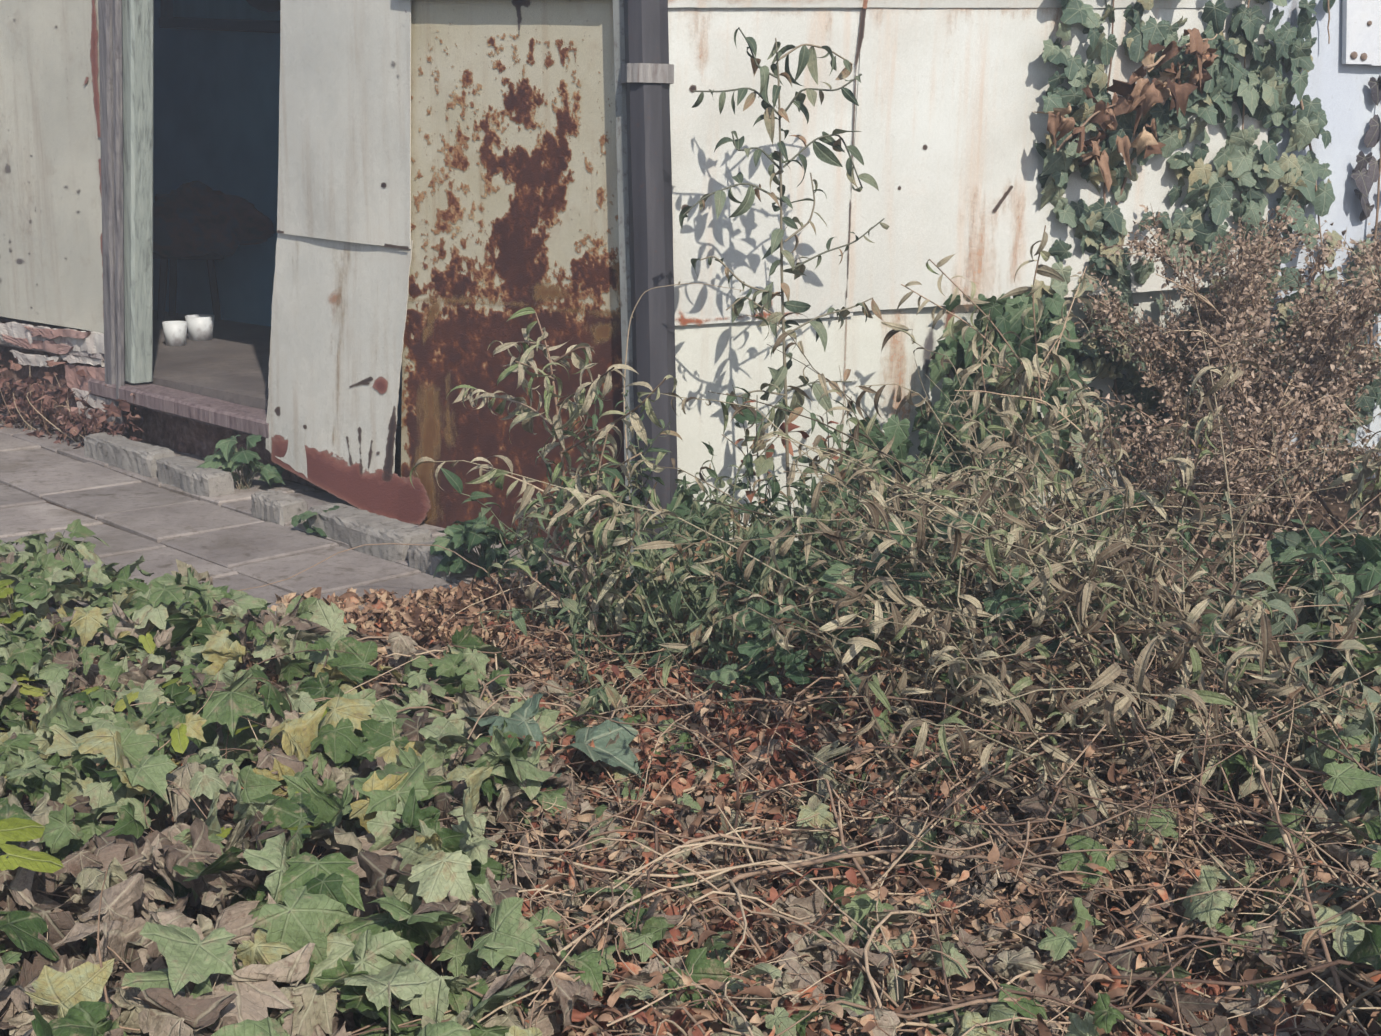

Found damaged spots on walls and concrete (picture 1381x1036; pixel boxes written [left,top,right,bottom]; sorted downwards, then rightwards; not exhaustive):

corrosion [372,0,632,580]